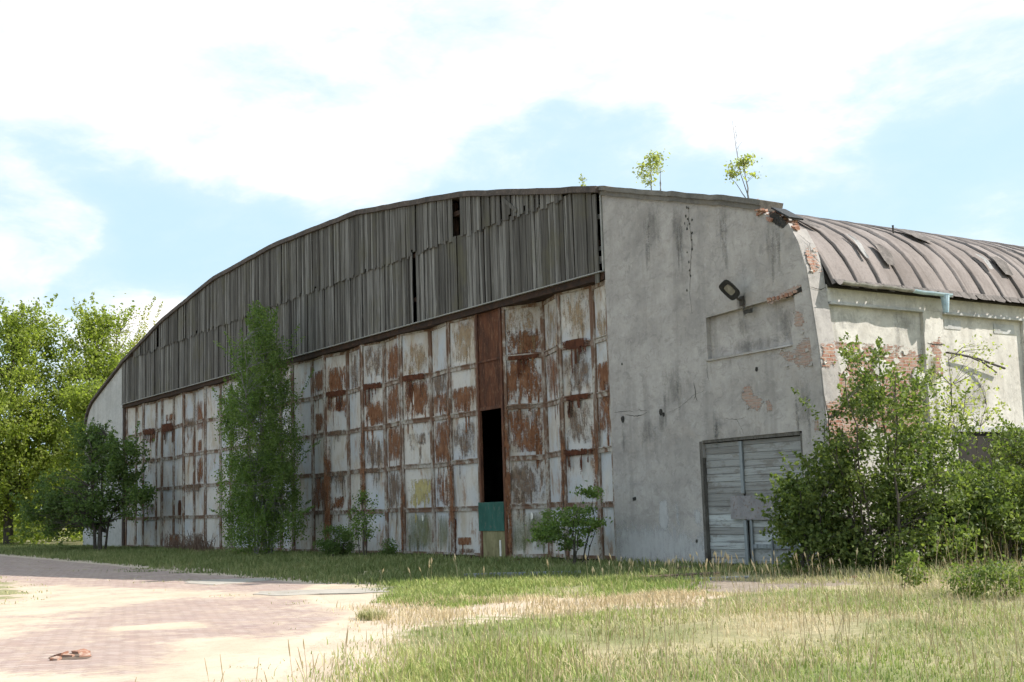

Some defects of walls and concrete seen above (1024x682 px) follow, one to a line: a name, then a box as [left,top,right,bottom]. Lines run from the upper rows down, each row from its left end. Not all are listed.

spalling [754,207,804,231]
spalling [767,284,802,304]
corrosion [143,401,203,546]
corrosion [314,344,476,553]
corrosion [503,294,610,555]
flaking render [779,311,944,453]